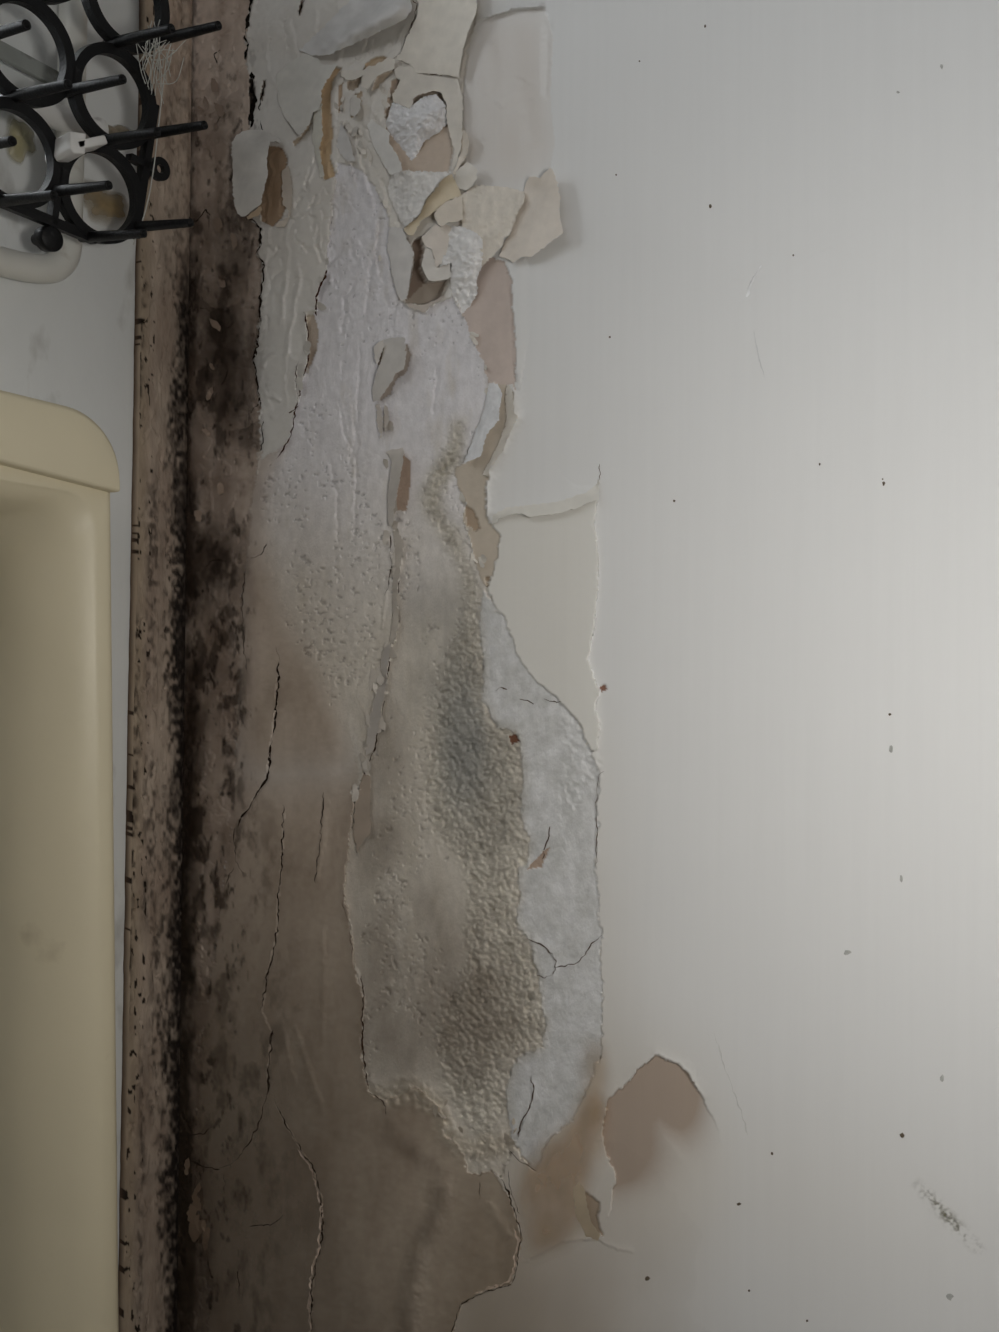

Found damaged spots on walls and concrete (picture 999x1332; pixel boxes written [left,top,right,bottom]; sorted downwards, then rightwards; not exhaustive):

crack [183,544,324,1332]
water stain [132,0,522,1332]
crack [314,792,386,1114]
spalling [231,0,603,1177]
crack [590,751,604,863]
peeling [603,1058,719,1223]